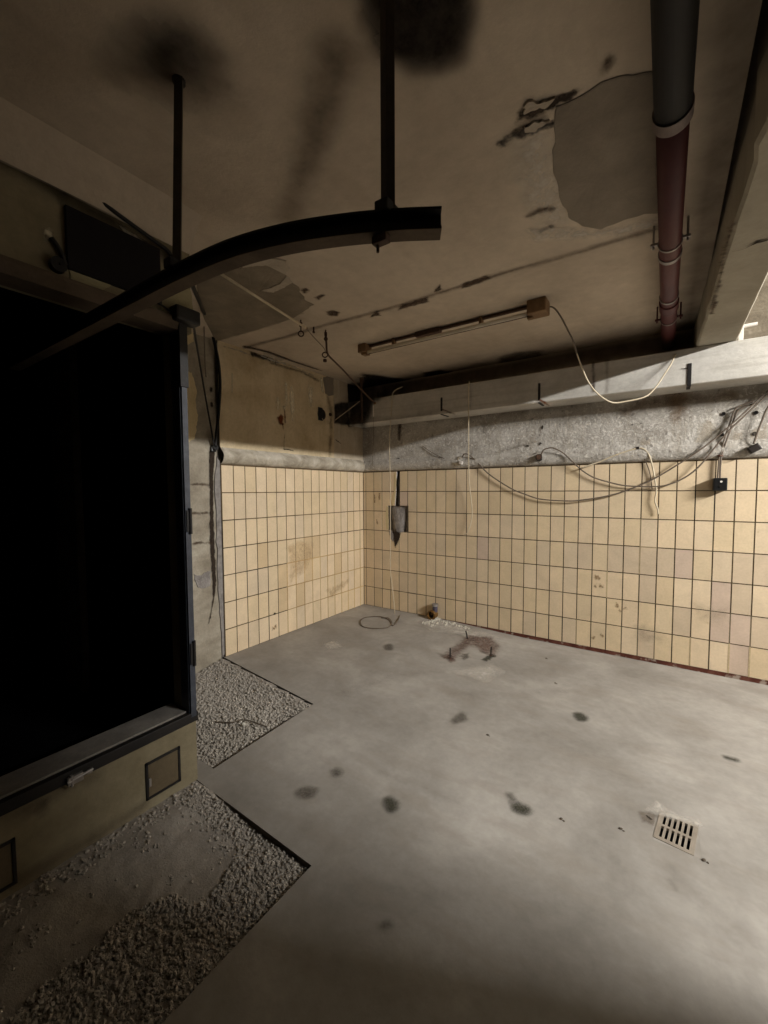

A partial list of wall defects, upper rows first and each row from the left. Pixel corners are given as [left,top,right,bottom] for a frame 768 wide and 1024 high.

spalling [497,58,658,239]
peeling [160,258,313,341]